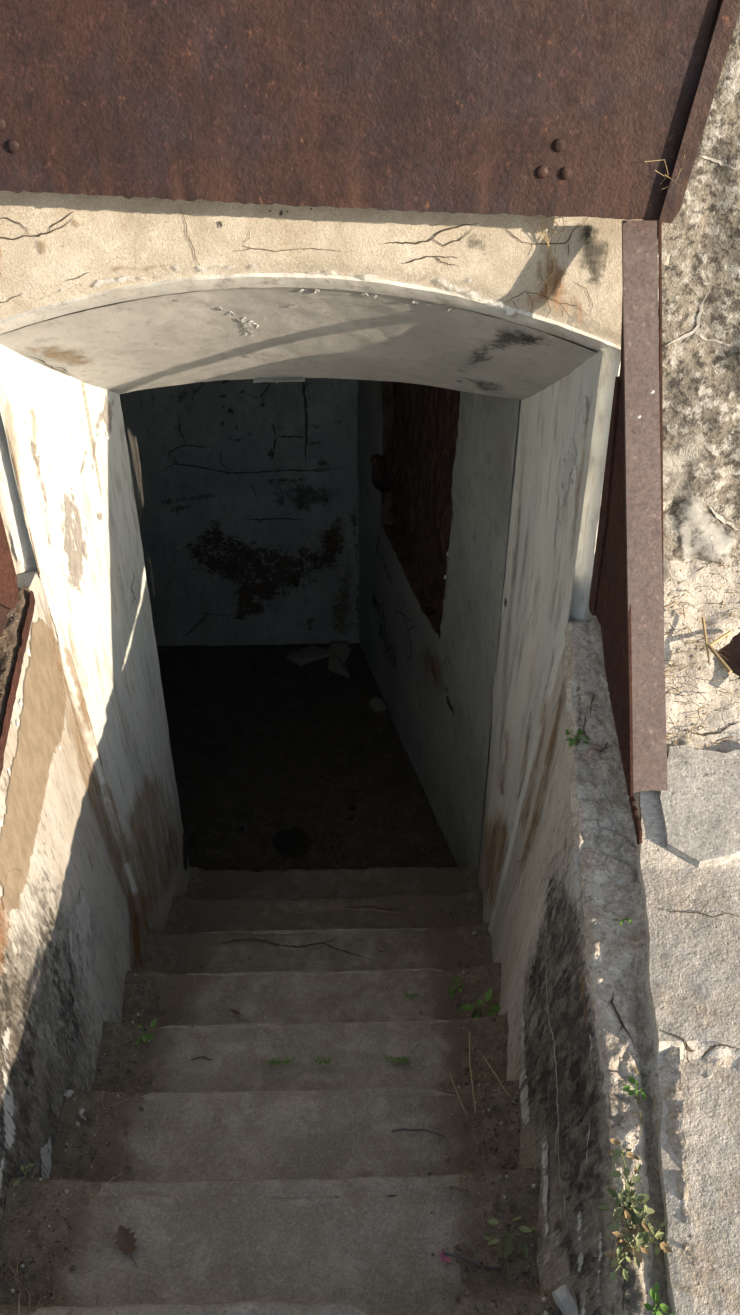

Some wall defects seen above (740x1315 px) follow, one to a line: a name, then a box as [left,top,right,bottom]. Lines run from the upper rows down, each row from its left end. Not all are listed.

crack [0,212,73,240]
crack [385,218,593,319]
water stain [581,225,608,282]
water stain [474,331,544,363]
peeling [81,394,115,474]
crack [162,382,353,523]
peeling [31,441,103,594]
peeling [177,515,352,621]
water stain [0,874,79,1209]
water stain [519,856,647,1315]